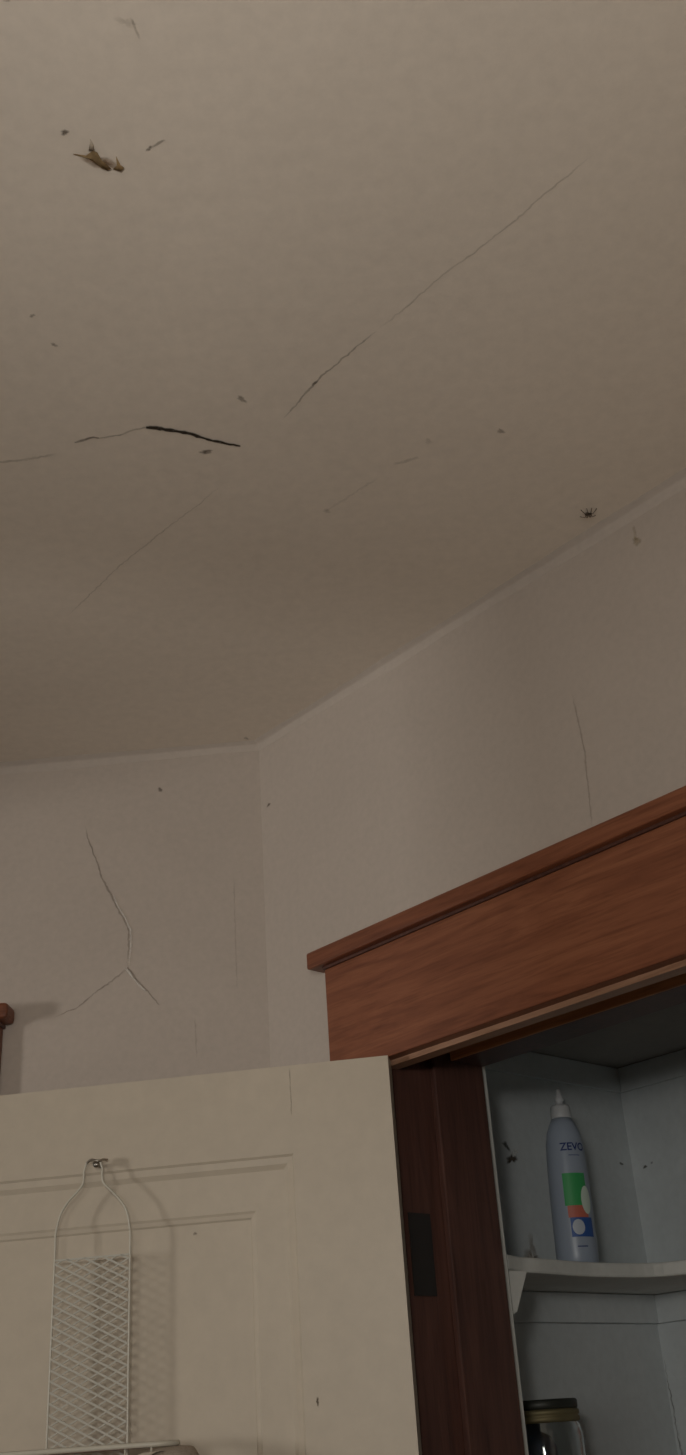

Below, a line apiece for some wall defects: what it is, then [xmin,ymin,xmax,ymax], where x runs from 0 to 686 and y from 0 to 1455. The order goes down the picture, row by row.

crack [146,426,240,447]